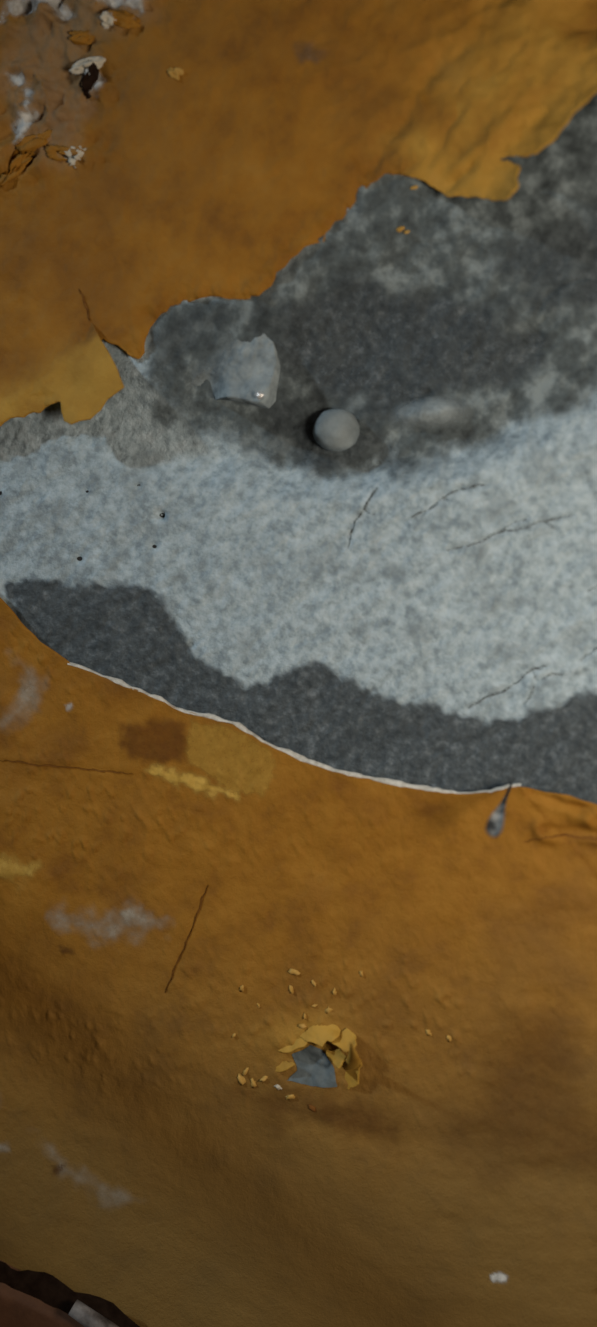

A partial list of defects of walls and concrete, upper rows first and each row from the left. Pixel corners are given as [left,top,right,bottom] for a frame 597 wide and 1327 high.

peeling [0,74,87,187]
peeling [8,0,143,99]
peeling [387,10,597,201]
peeling [0,323,597,725]
crack [412,484,485,517]
crack [447,517,560,551]
crack [469,648,597,708]
peeling [67,662,521,838]
peeling [237,987,362,1112]